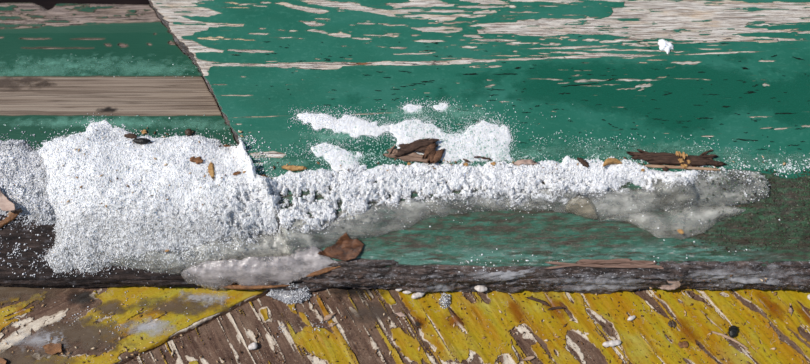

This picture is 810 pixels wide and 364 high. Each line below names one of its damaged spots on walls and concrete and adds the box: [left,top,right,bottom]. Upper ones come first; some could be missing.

peeling [0,0,810,116]
peeling [250,151,286,164]
water stain [347,143,412,165]
peeling [0,286,810,364]